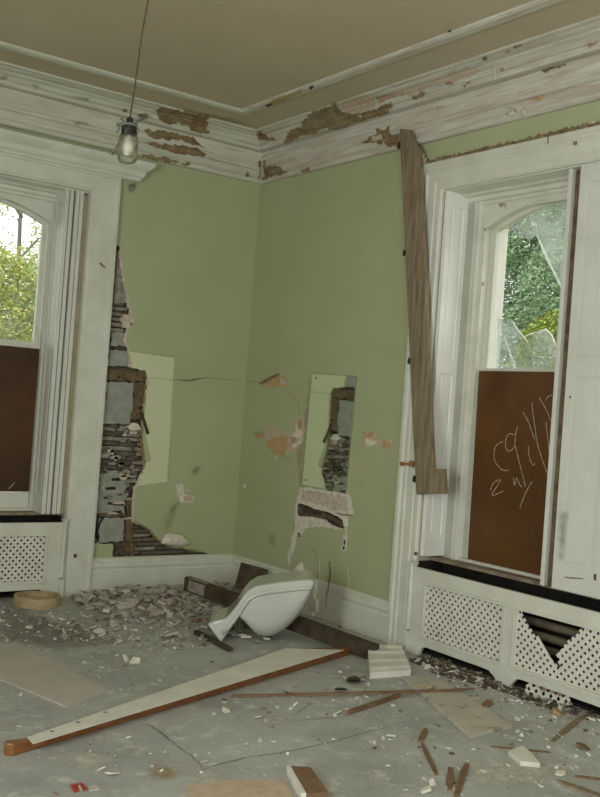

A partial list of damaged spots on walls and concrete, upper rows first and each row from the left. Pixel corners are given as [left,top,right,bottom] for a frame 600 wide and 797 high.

flaking render [137,107,212,166]
flaking render [245,160,287,180]
flaking render [257,57,488,144]
flaking render [362,126,400,148]
flaking render [94,250,202,556]
crack [155,376,258,384]
peeling [254,373,305,461]
flaking render [301,430,393,527]